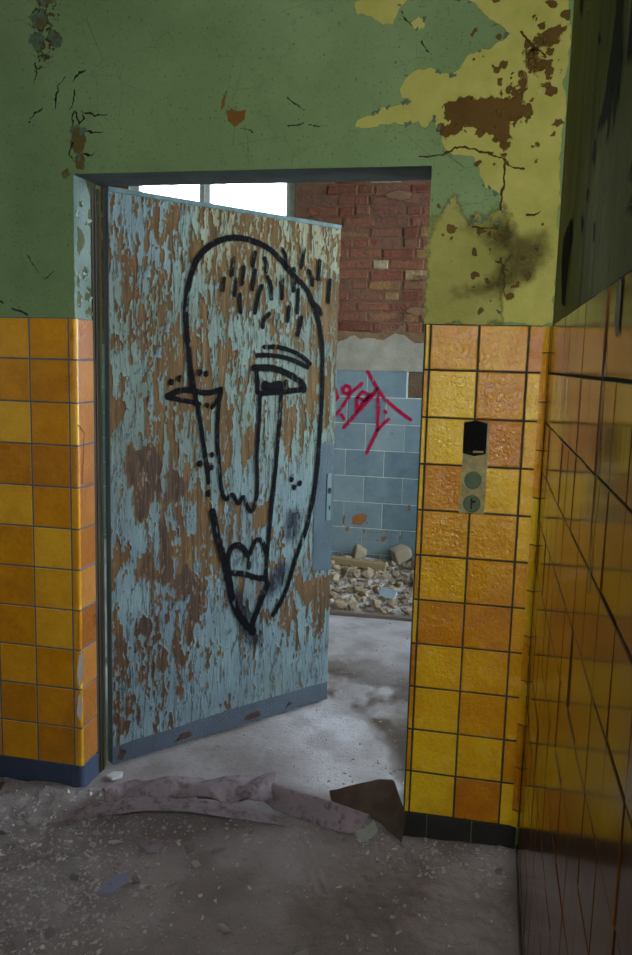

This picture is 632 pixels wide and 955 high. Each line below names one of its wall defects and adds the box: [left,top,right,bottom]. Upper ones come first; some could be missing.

crack [28,62,107,162]
damp [436,0,584,167]
crack [520,31,546,55]
crack [419,146,525,229]
crack [495,258,512,296]
damp [471,216,544,315]
peeling [61,0,573,759]